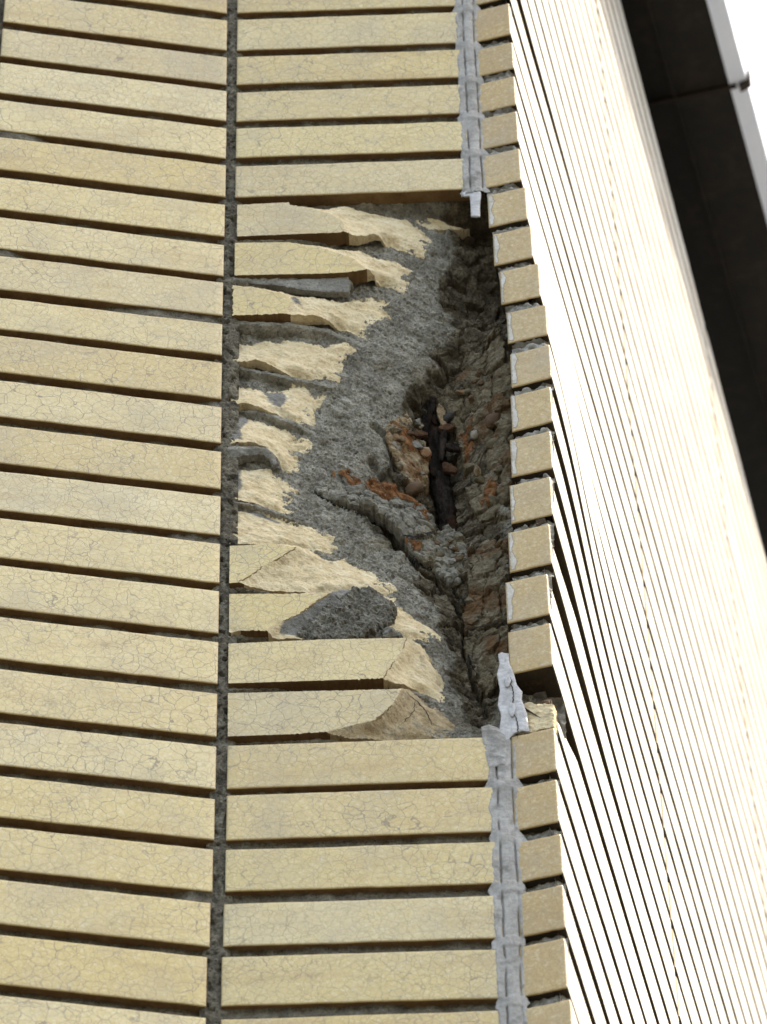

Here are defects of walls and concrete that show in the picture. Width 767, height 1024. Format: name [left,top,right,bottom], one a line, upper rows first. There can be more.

crack [316,494,378,526]
spalling [227,191,514,746]
rust [332,469,428,521]
rust [399,396,476,479]
crack [399,530,506,675]